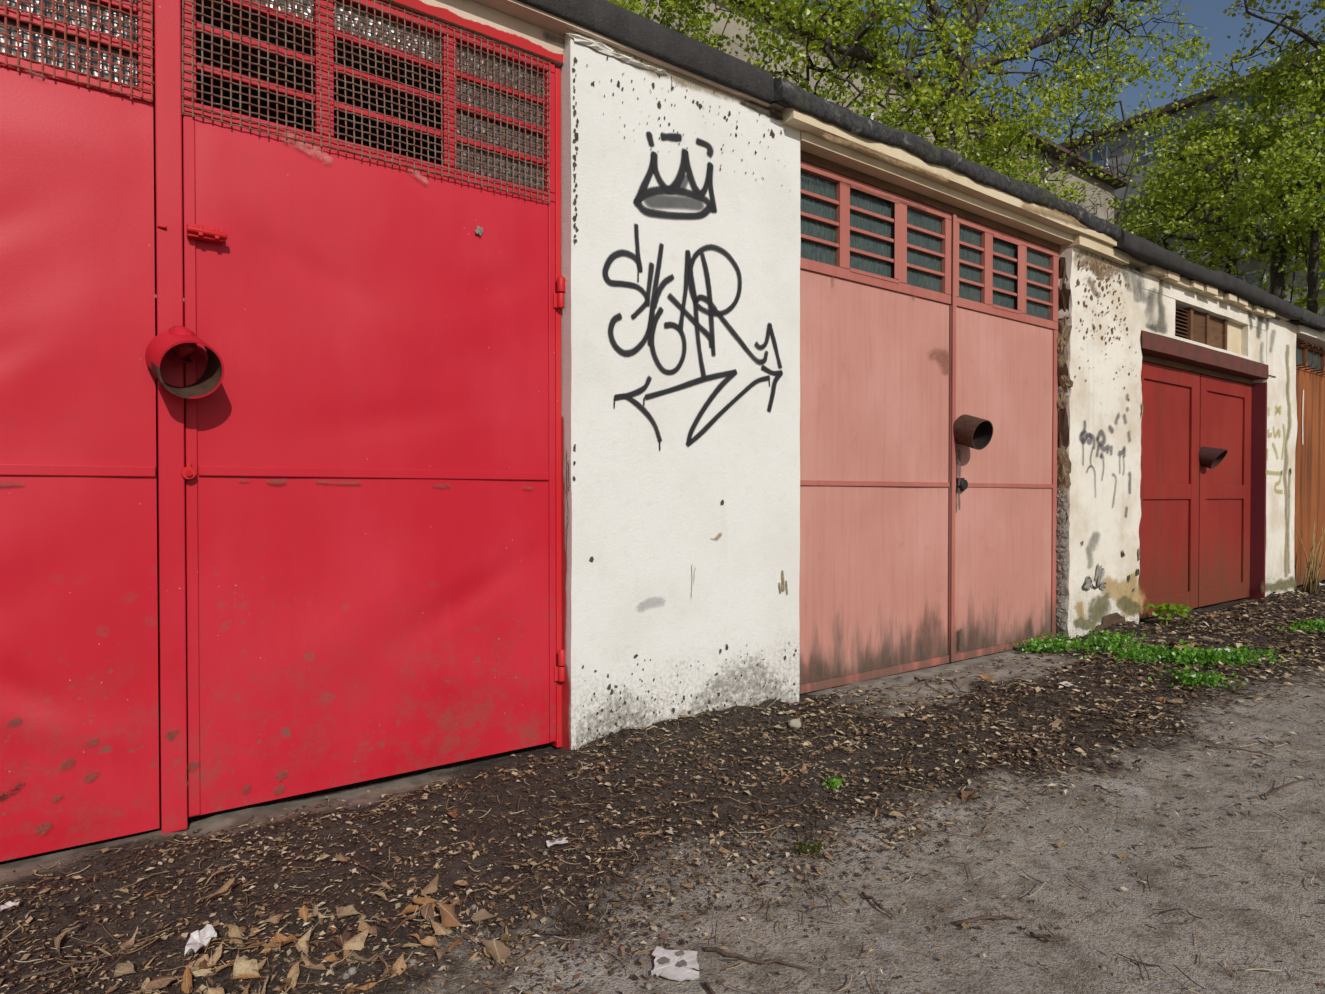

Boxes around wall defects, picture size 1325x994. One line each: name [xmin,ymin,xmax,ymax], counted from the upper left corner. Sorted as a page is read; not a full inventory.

spalling [1055,257,1073,639]
peeling [1084,563,1106,591]
flaking render [1093,612,1135,633]
leakage [683,660,797,717]
leakage [576,697,649,743]